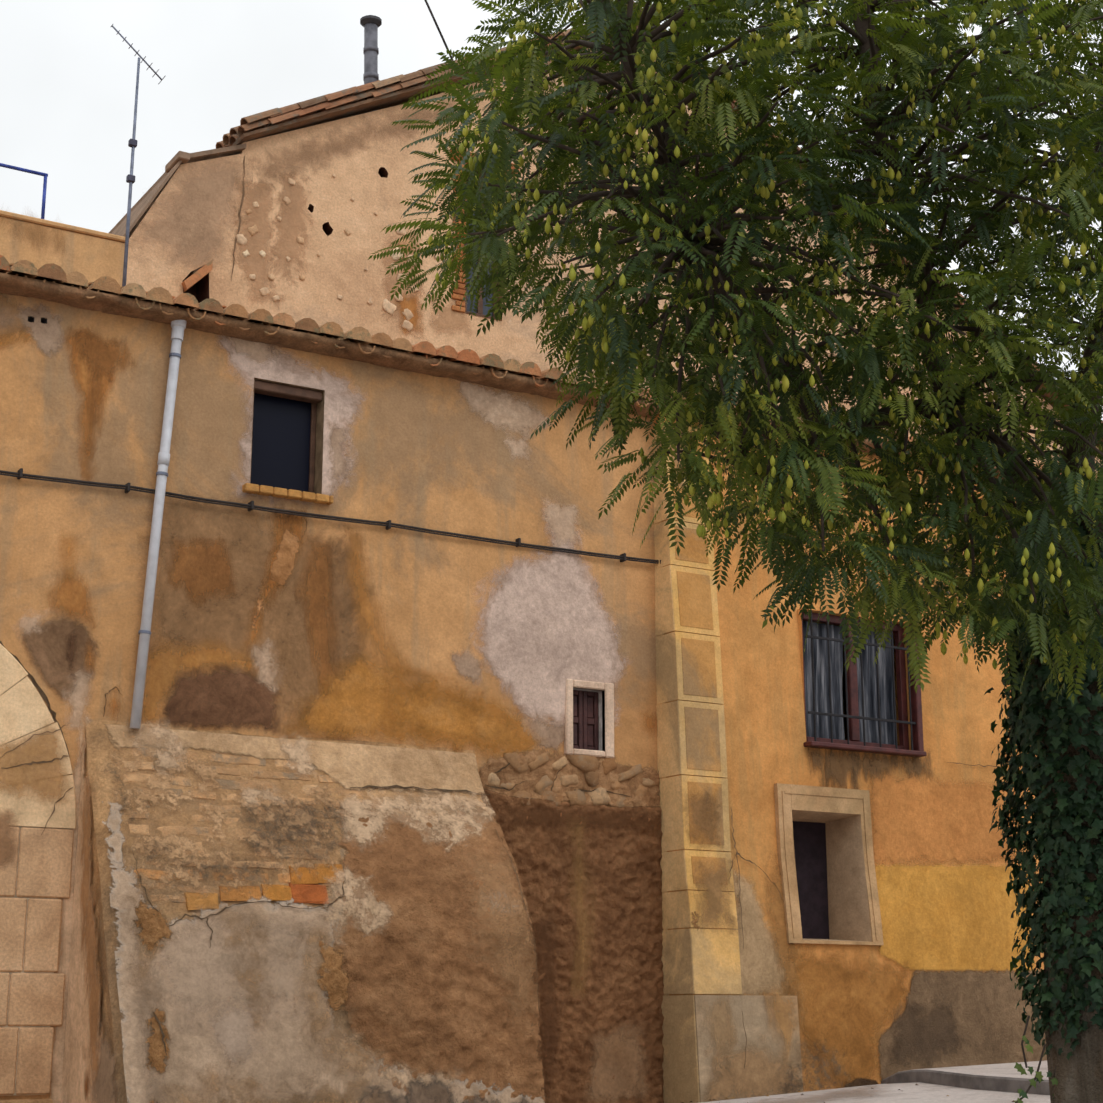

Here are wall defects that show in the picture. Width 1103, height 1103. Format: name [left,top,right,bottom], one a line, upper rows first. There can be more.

crack [231,156,245,281]
peeling [545,503,578,546]
water stain [133,501,534,774]
crack [0,641,73,835]
water stain [182,788,495,882]
crack [132,850,345,947]
spalling [145,1008,171,1074]
water stain [148,869,499,1103]